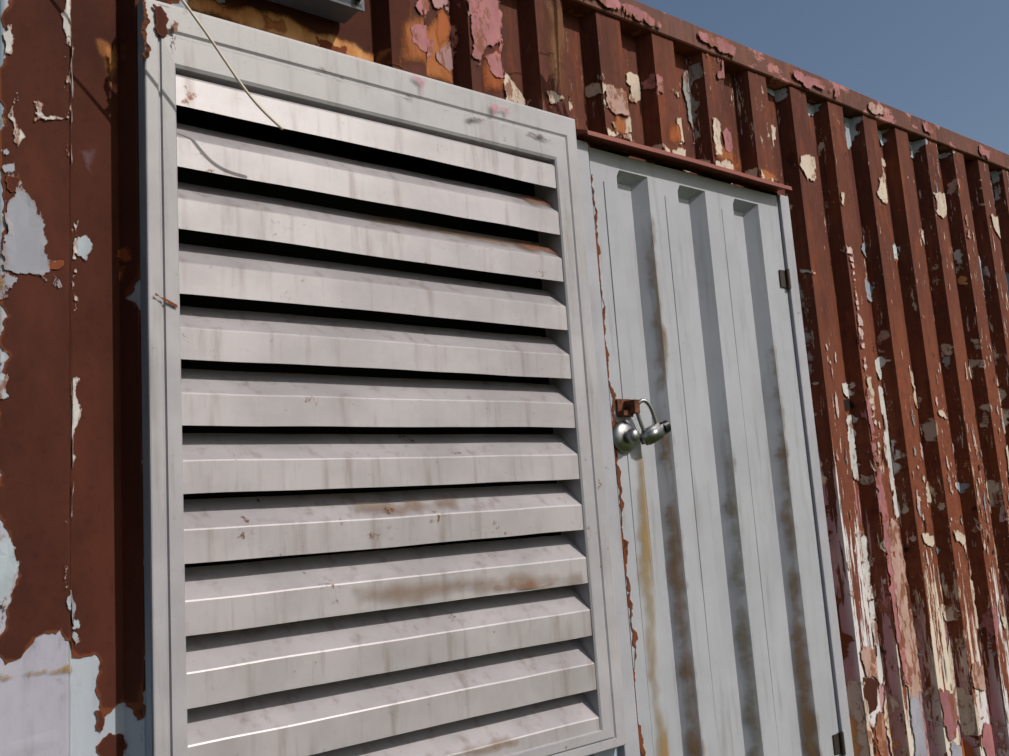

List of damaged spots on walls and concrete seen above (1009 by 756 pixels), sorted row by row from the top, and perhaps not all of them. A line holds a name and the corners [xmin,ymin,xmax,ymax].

rust [156,0,453,83]
peeling [411,0,531,106]
peeling [585,72,664,142]
peeling [649,31,779,183]
peeling [0,92,64,300]
rust [0,0,146,756]
rust [591,175,617,429]
peeling [0,535,21,626]
rust [614,446,646,756]
rust [670,507,683,624]
peeling [842,329,1009,756]
rust [793,622,821,756]